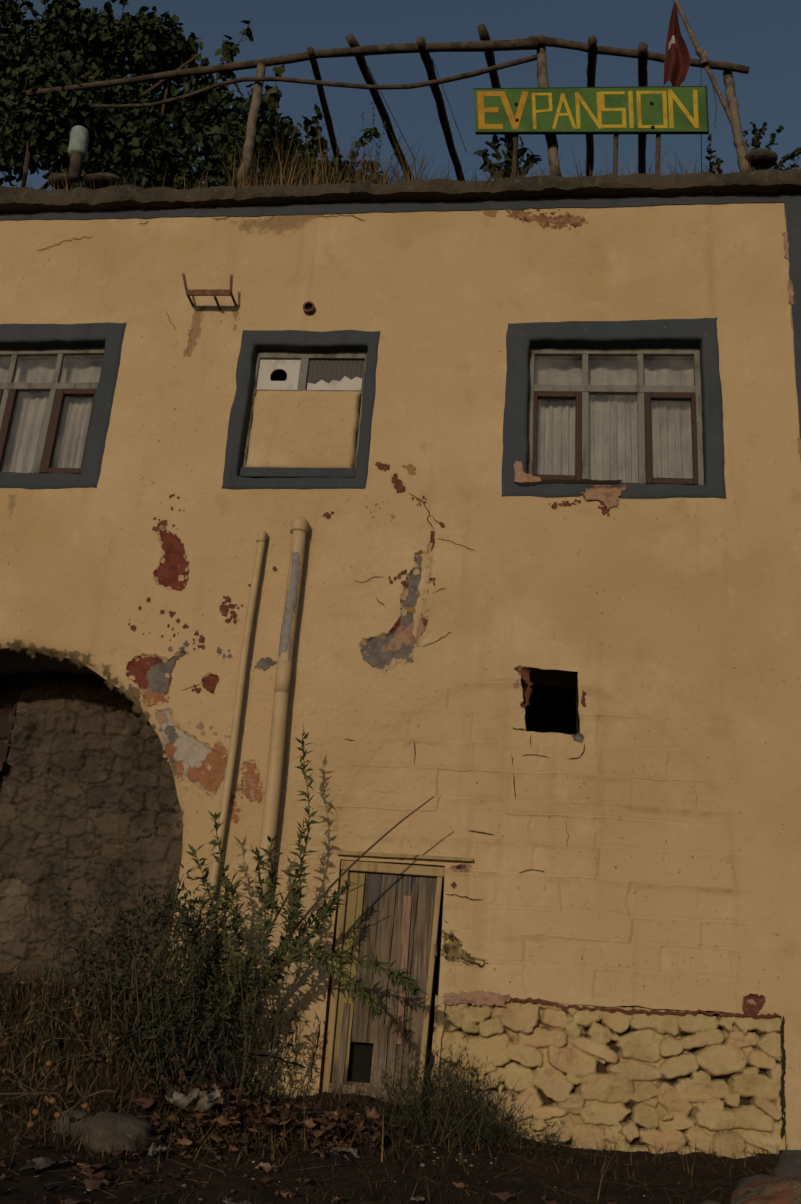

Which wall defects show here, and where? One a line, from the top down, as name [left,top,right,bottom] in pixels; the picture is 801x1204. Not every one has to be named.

peeling [479,208,588,231]
crack [38,236,90,251]
flaking render [514,460,541,483]
crack [366,462,475,551]
flaking render [549,485,626,516]
peeling [255,551,300,671]
flaking render [360,531,435,673]
peeling [126,494,265,824]
flaking render [441,921,487,968]
flaking render [442,990,780,1019]